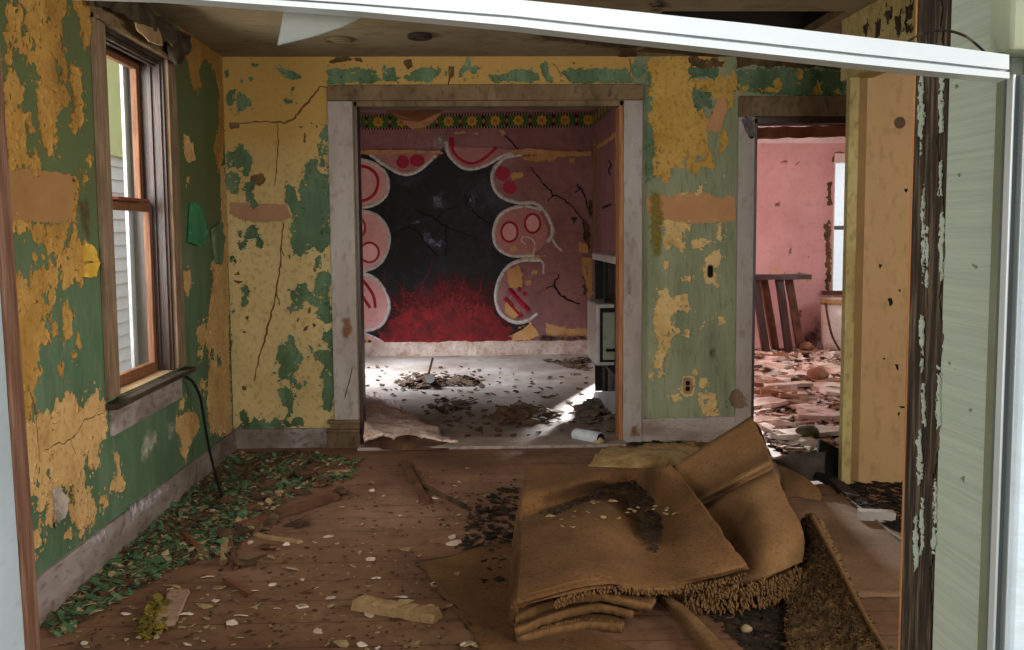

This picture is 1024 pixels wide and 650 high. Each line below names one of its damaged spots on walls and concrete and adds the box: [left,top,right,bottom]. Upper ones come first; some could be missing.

peeling [863,0,943,46]
peeling [1,0,126,562]
crack [34,403,103,460]
peeling [175,26,334,464]
crack [254,223,285,381]
crack [240,86,327,186]
crack [504,135,612,241]
crack [546,274,580,305]
peeling [326,47,846,381]
peeling [912,76,959,650]